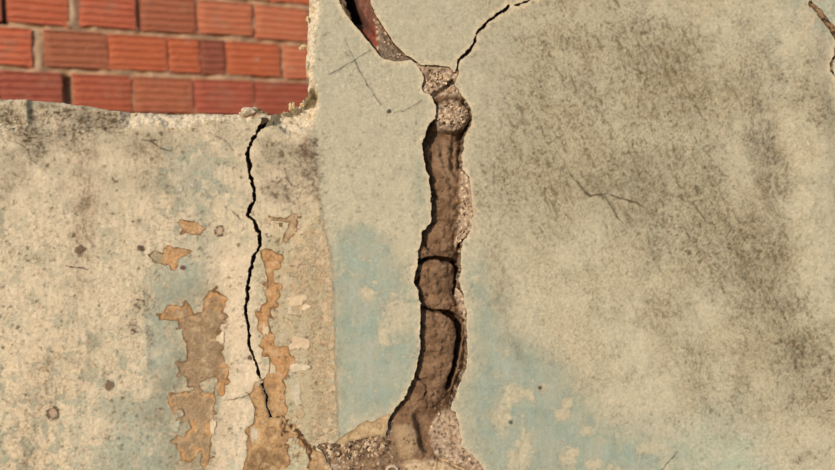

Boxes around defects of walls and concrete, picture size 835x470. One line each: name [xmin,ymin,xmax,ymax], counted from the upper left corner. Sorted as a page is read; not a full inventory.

spalling [265,0,321,139]
crack [808,0,835,39]
peeling [137,245,192,274]
peeling [156,286,230,468]
peeling [172,219,224,236]
crack [237,120,312,460]
peeling [243,213,403,470]
crack [339,0,528,470]